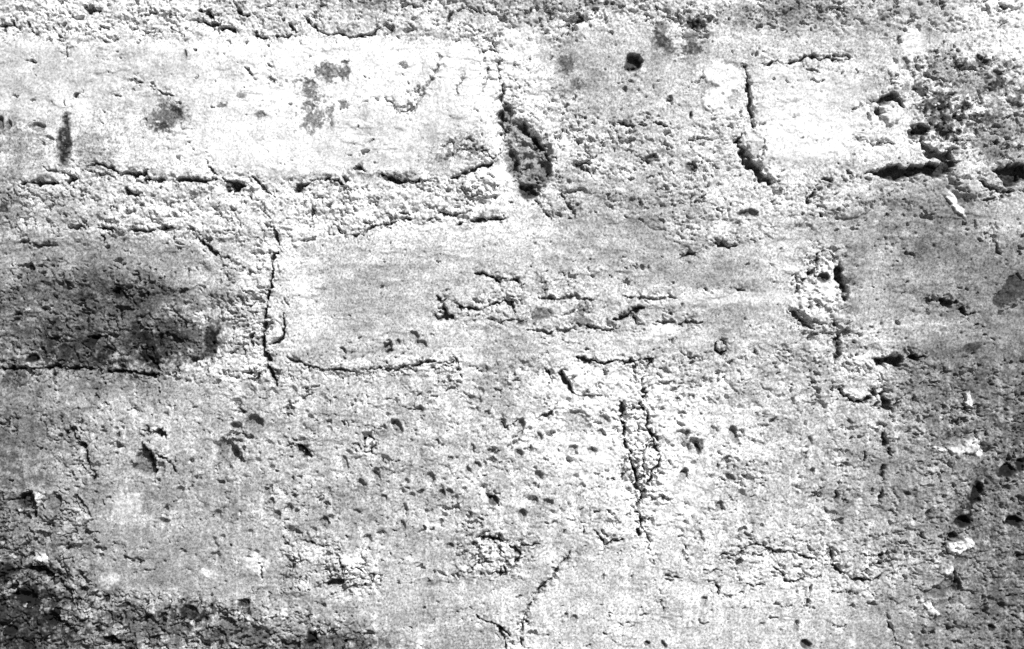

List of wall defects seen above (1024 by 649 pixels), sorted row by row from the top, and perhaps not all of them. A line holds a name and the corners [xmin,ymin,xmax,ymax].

crack [18,158,219,198]
crack [250,3,595,239]
crack [741,52,853,164]
crack [235,227,460,388]
crack [433,270,903,649]
crack [862,427,916,506]